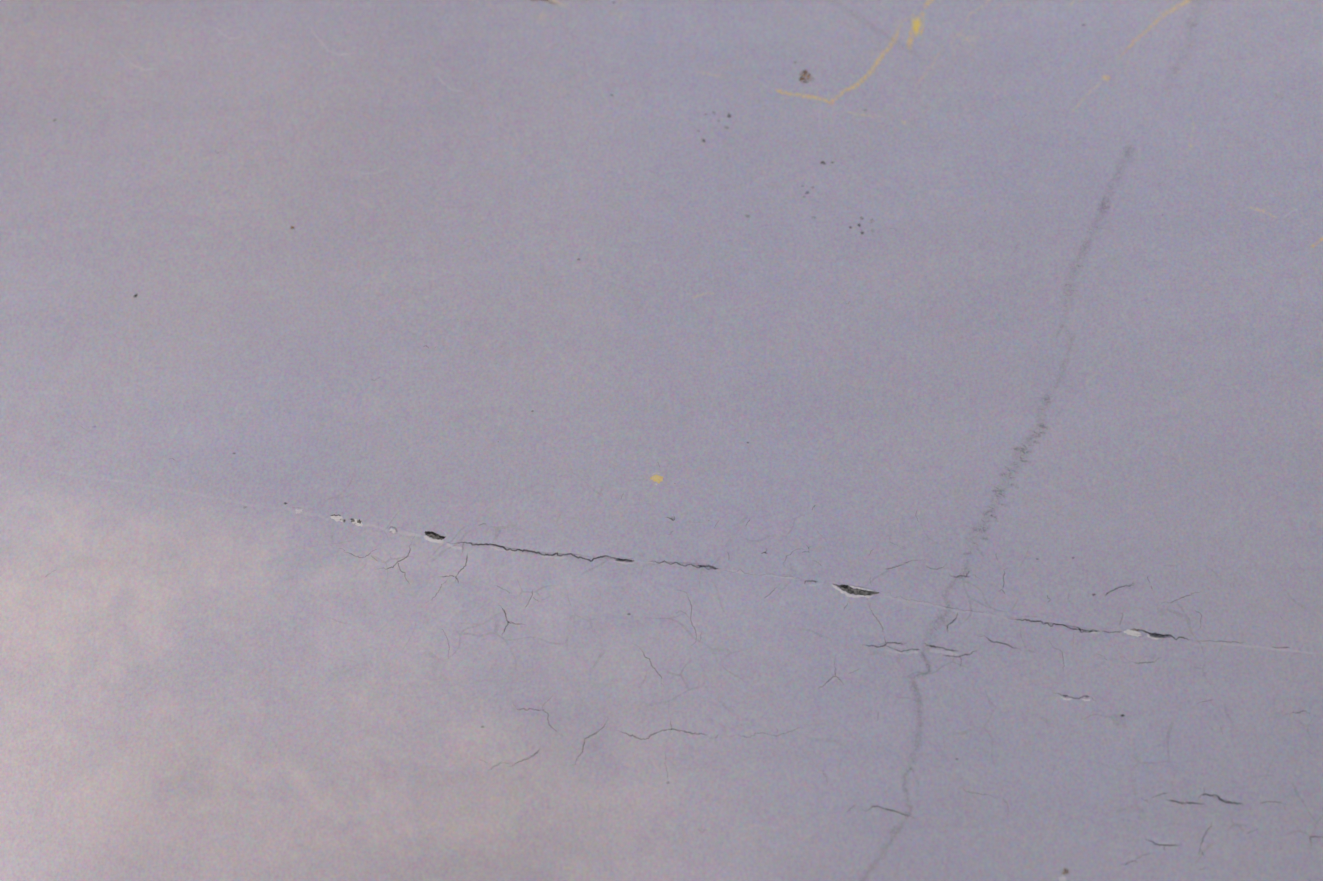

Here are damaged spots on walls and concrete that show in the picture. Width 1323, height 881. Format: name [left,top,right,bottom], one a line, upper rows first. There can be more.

hole [422,524,447,544]
crack [44,470,824,643]
spalling [831,579,881,598]
crack [871,572,1100,656]
crack [1138,629,1321,654]
crack [1170,791,1245,804]